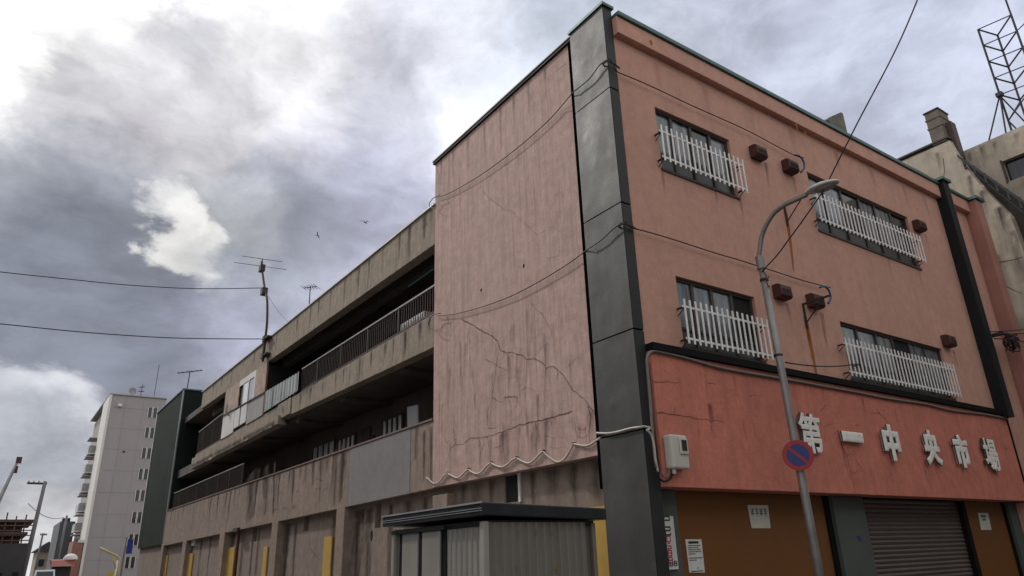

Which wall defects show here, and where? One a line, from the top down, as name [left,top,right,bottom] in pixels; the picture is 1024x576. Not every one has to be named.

rust [804,318,817,374]